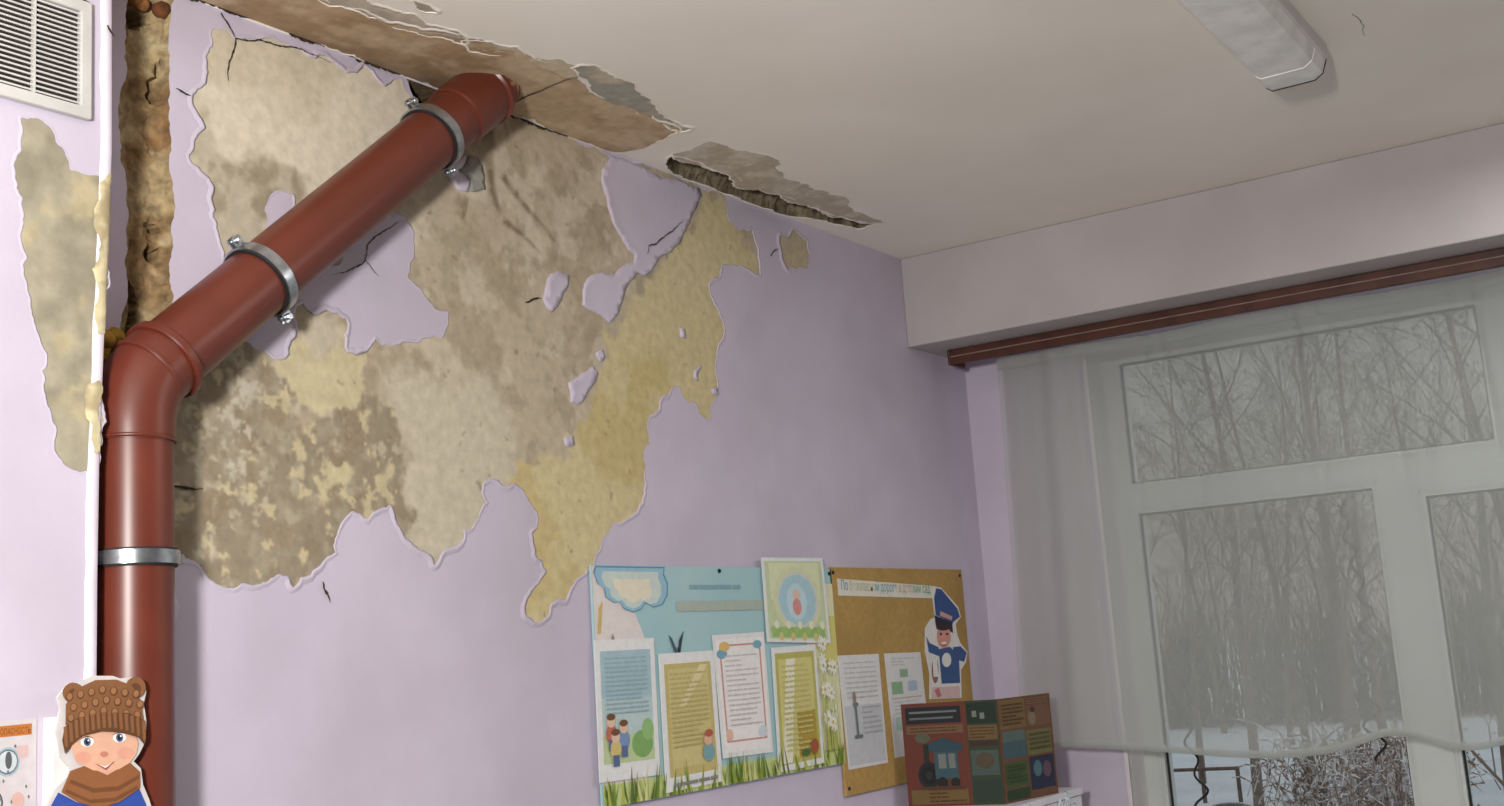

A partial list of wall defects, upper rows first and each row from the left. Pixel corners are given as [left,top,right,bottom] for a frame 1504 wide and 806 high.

crack [190,0,407,81]
crack [510,77,577,137]
peeling [10,0,886,628]